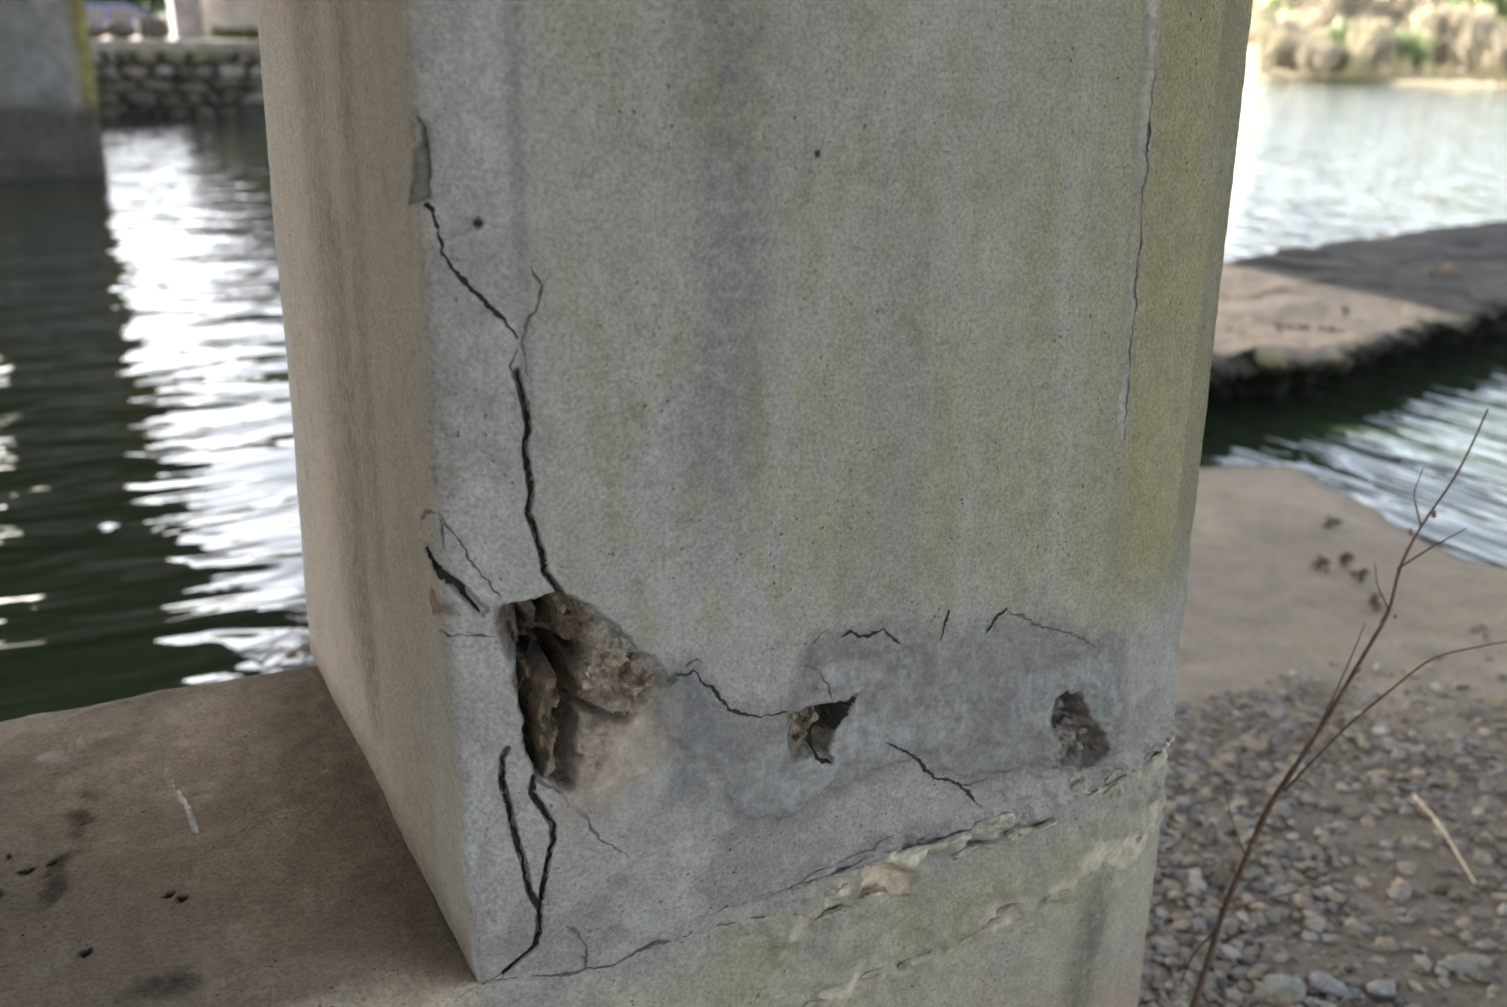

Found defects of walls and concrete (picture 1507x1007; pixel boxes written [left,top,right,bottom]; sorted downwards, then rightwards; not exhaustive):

crack [424,202,562,592]
spalling [419,508,674,811]
crack [667,658,788,718]
crack [804,628,901,698]
crack [941,610,950,639]
crack [986,608,1107,648]
spalling [787,696,856,765]
crack [884,741,1010,808]
spalling [1051,691,1175,801]
crack [482,748,906,985]
peeling [784,794,1164,1007]